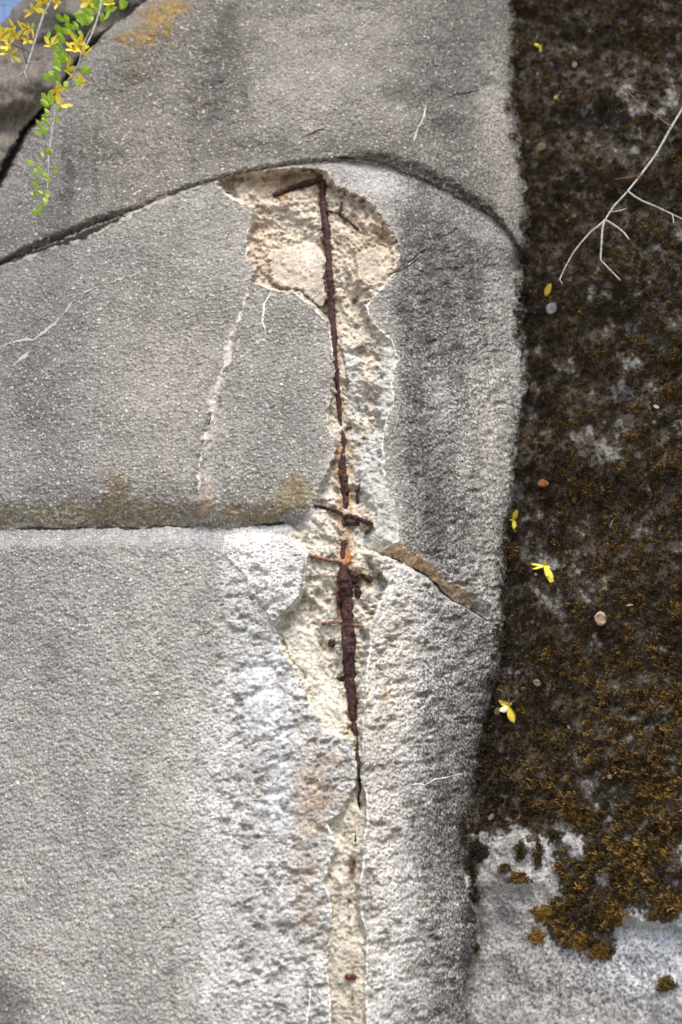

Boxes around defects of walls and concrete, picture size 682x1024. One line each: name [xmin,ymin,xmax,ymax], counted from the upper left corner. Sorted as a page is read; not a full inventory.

crack [390,231,454,275]
damp [0,304,247,528]
spalling [15,166,400,1024]
crack [196,284,271,491]
damp [222,475,314,526]
corrosion [329,445,373,614]
corrosion [291,757,343,927]